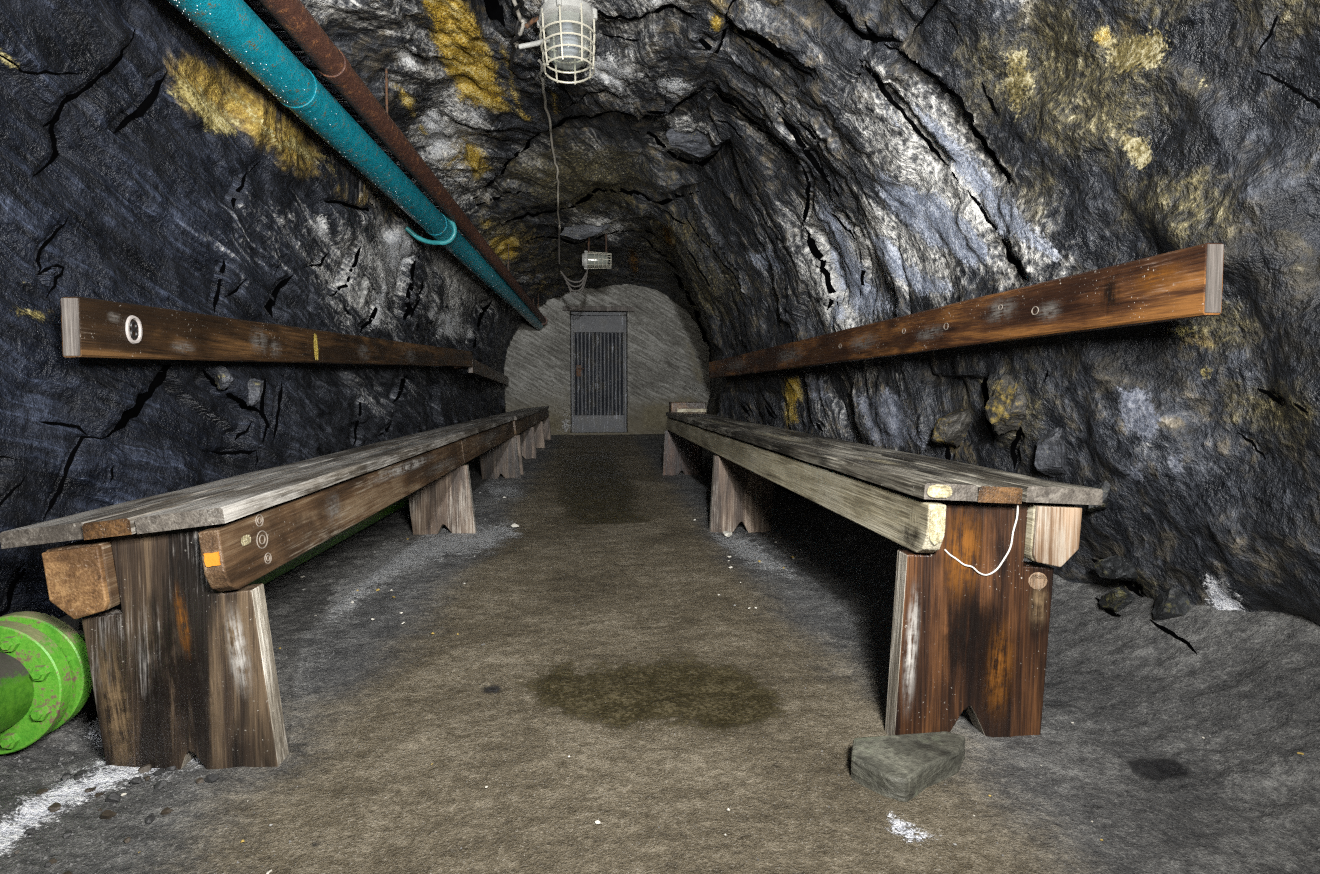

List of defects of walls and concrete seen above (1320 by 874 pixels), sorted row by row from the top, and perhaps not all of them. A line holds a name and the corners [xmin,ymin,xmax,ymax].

damp [517,652,787,734]